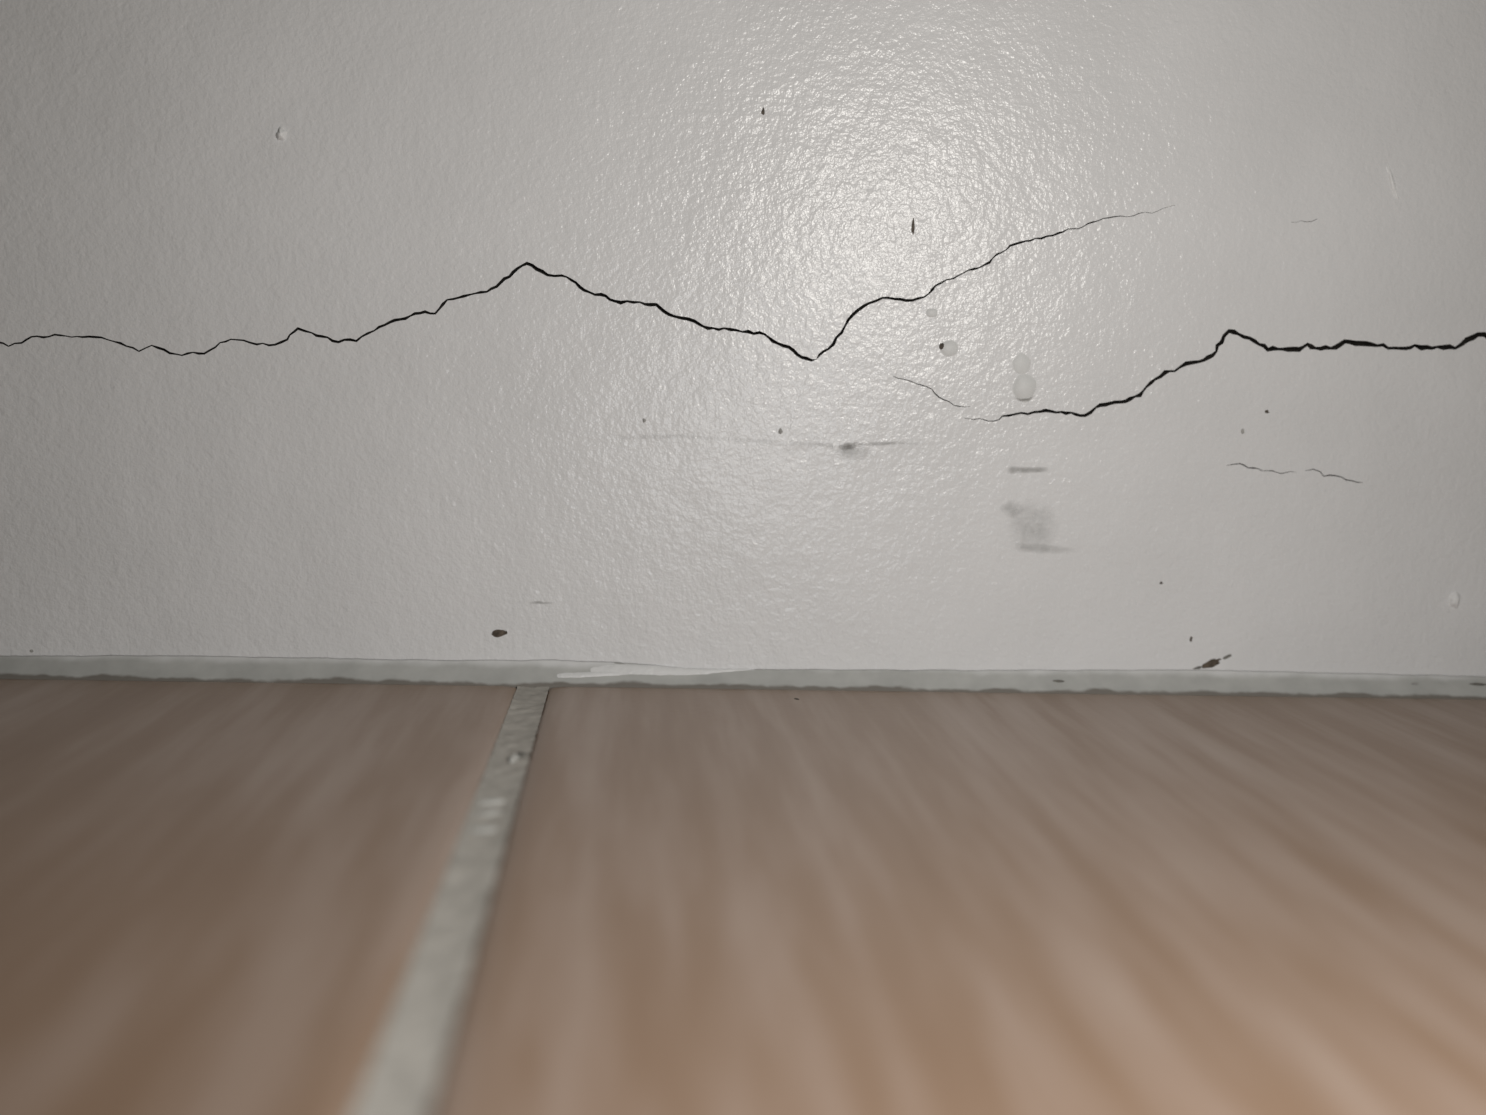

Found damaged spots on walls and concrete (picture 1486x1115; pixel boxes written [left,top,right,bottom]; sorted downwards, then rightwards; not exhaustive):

crack [0,205,1174,361]
crack [894,329,1486,422]